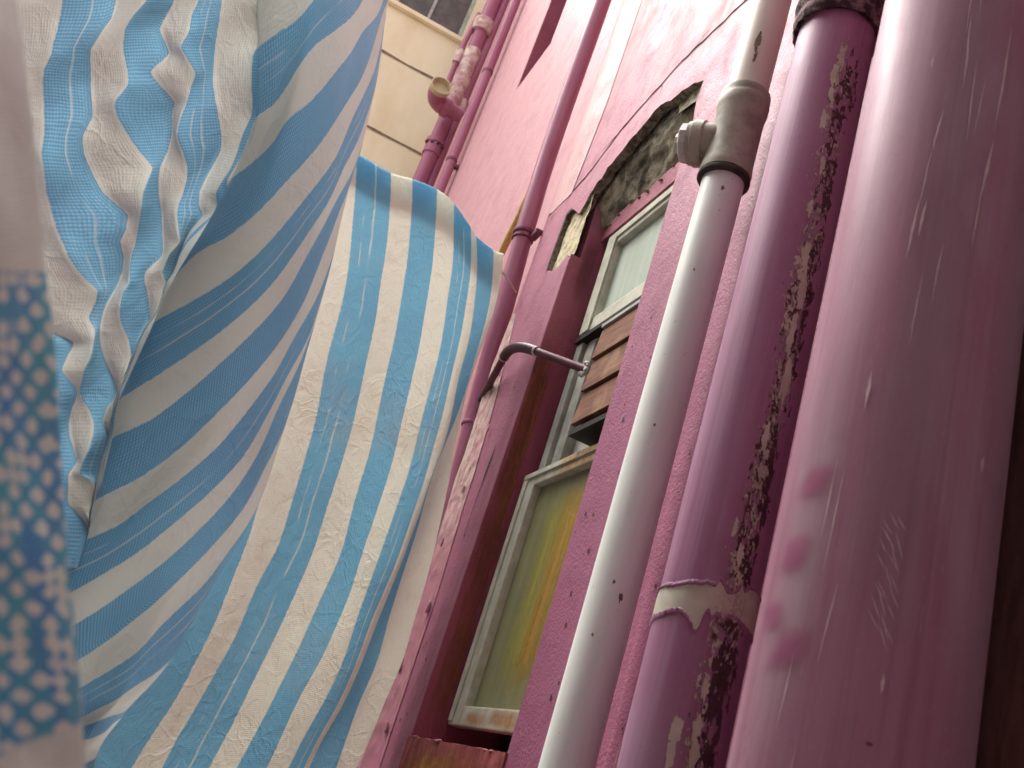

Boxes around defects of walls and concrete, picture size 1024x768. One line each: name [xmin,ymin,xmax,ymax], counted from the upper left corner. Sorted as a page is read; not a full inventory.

spalling [546,87,701,271]
peeling [649,38,861,768]